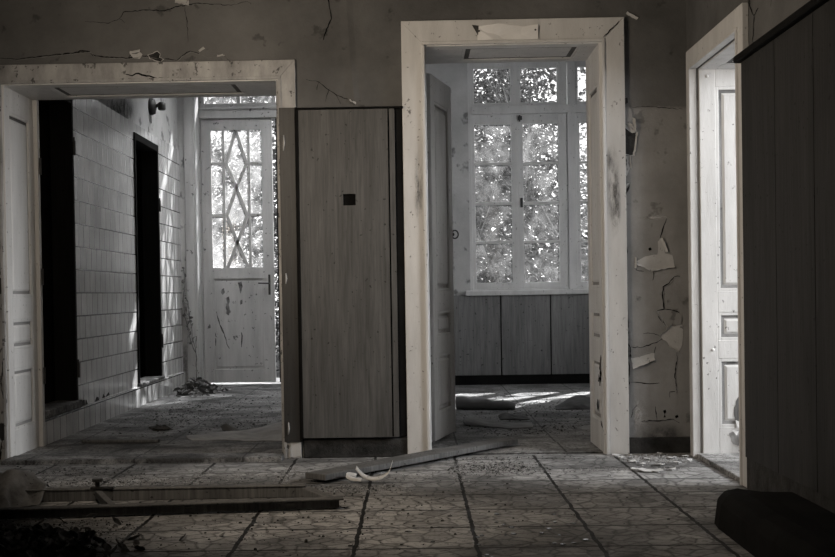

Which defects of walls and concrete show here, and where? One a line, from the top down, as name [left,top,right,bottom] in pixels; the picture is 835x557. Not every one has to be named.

peeling [627,238,675,272]
crack [627,248,680,423]
peeling [660,324,683,353]
peeling [631,353,655,369]